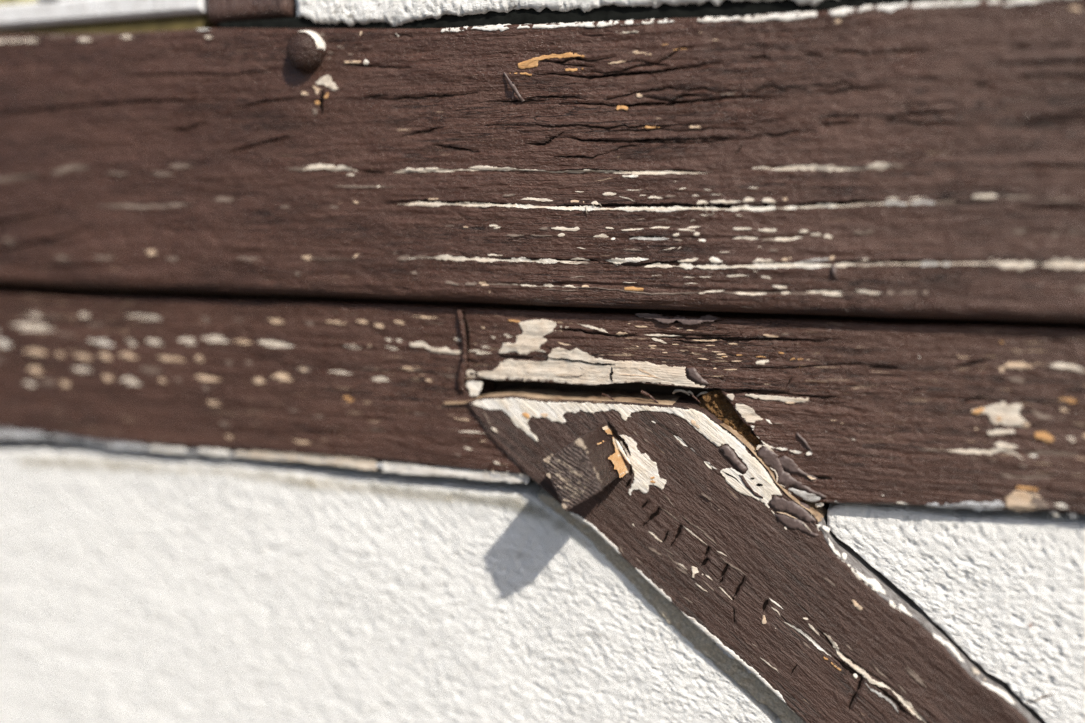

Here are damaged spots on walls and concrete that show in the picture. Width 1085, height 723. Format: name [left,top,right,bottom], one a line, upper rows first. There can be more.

peeling [441,18,674,34]
peeling [697,0,1041,33]
crack [356,44,1085,172]
crack [462,309,470,364]
crack [497,353,616,382]
crack [561,329,901,398]
peeling [0,422,529,484]
peeling [304,312,912,617]
peeling [922,398,1085,517]
crack [641,500,682,546]
crack [701,547,745,622]
peeling [681,611,786,703]